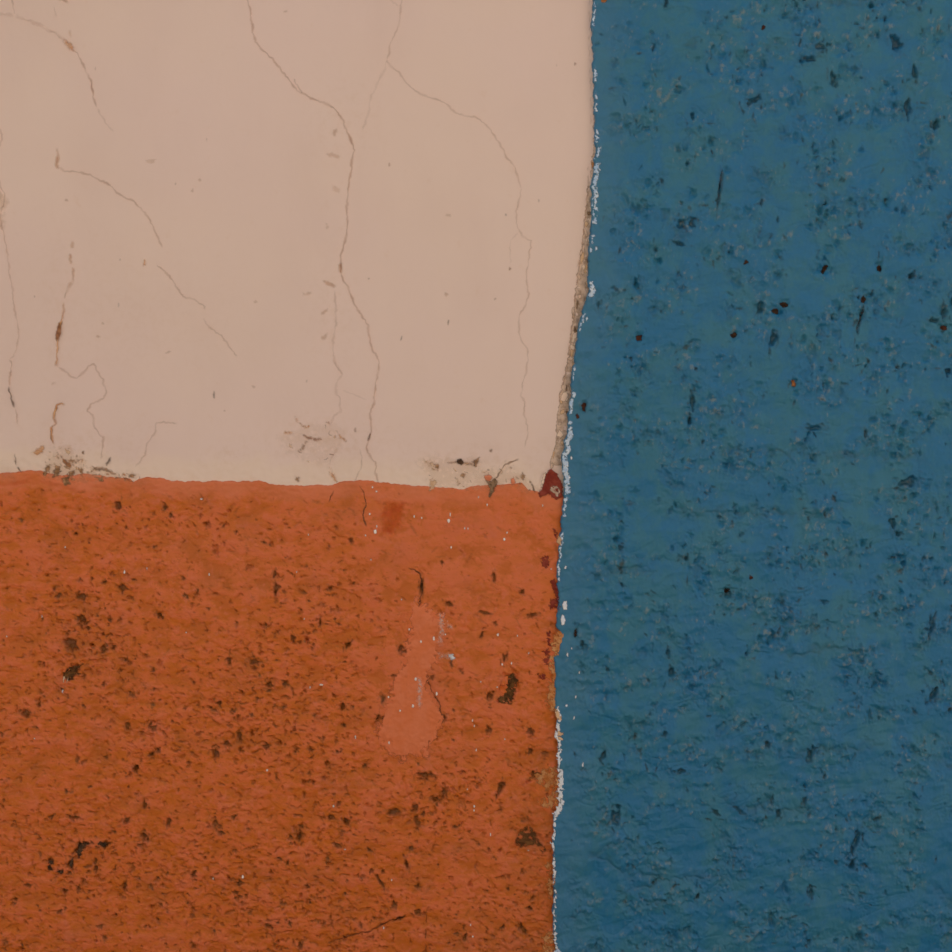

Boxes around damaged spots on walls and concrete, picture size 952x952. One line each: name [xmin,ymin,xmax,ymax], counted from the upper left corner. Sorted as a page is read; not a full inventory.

flaking render [484,460,516,497]
flaking render [511,95,601,517]